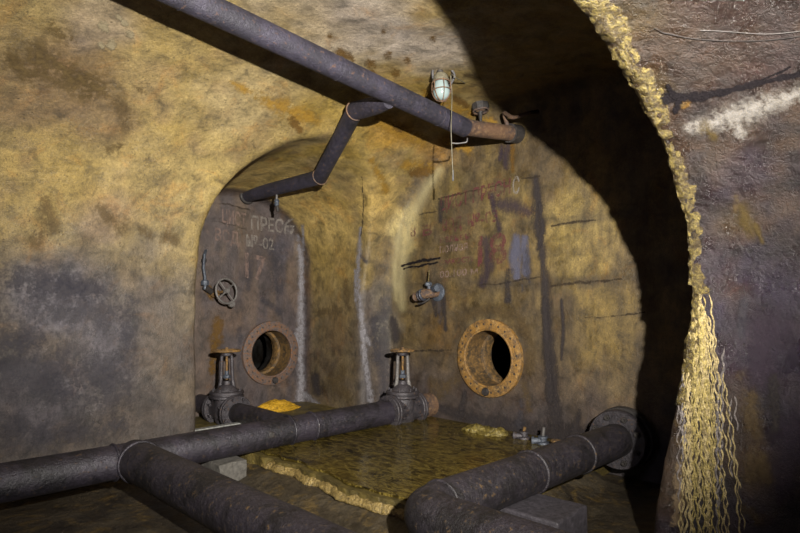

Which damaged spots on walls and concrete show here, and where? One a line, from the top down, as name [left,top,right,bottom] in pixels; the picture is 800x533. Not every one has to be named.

damp [686,88,800,138]
damp [295,226,321,404]
damp [344,227,373,403]
damp [431,175,589,440]
damp [573,0,746,533]